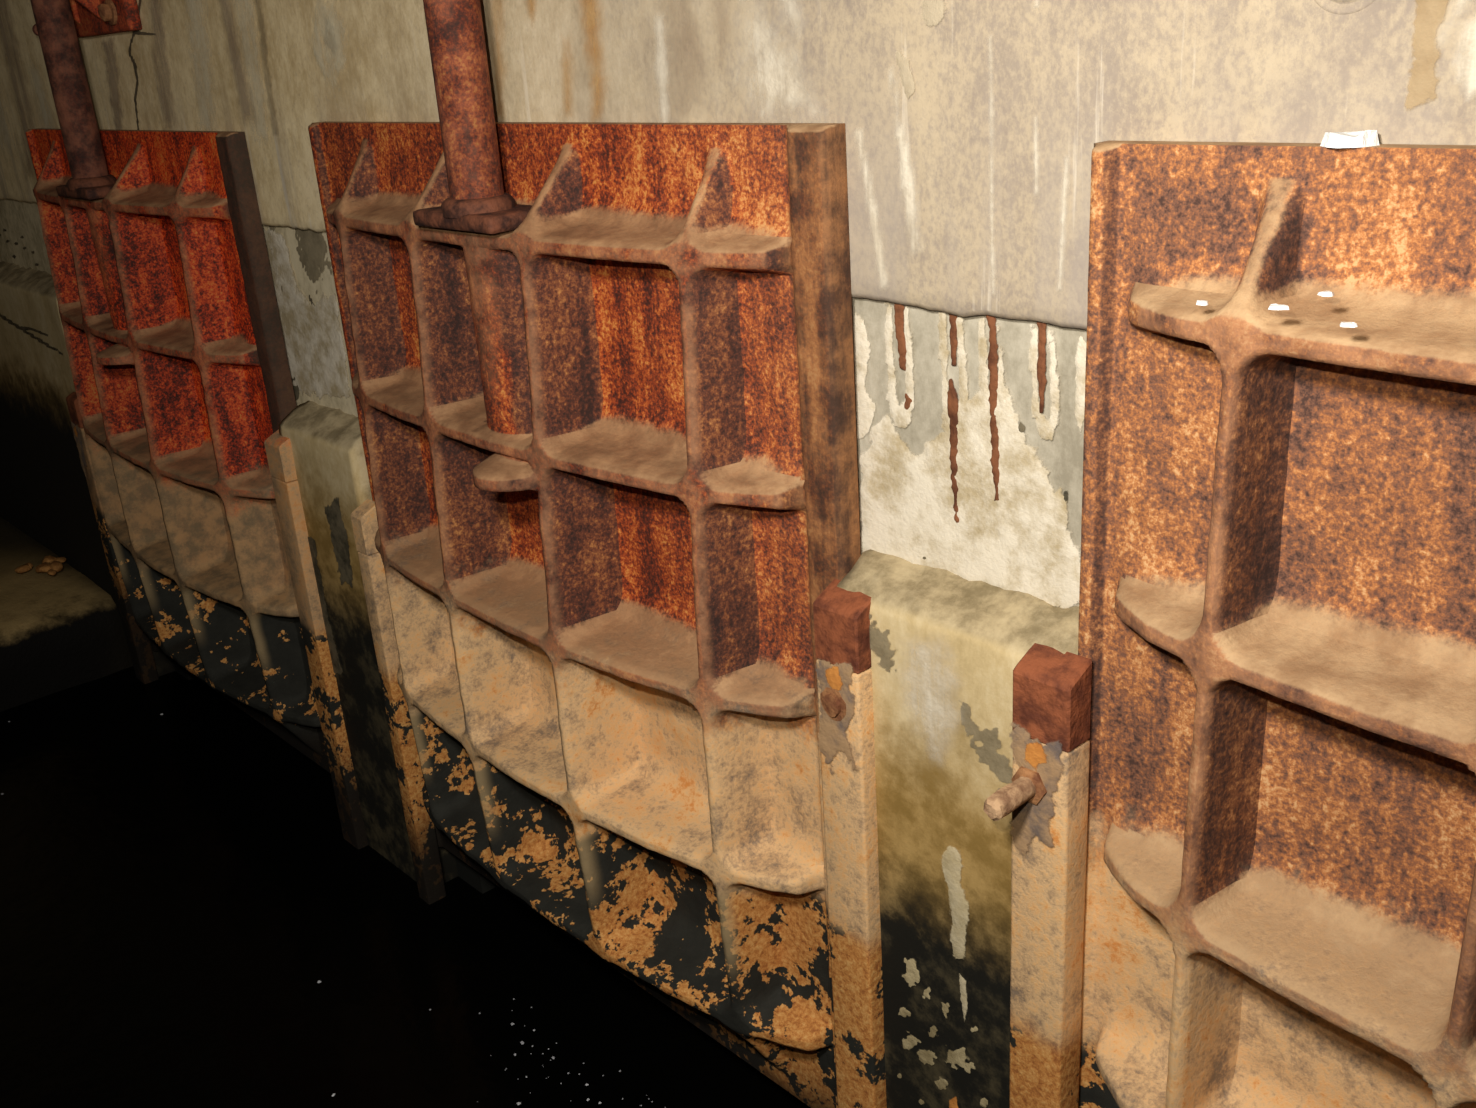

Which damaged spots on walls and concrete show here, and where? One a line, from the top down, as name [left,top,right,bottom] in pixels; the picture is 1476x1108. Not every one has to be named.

crack [128,0,156,130]
rust [894,303,907,371]
rust [947,314,959,523]
rust [986,315,1000,501]
rust [1037,321,1047,413]
rust [825,666,843,691]
leakage [869,614,1013,790]
leakage [942,846,969,1019]